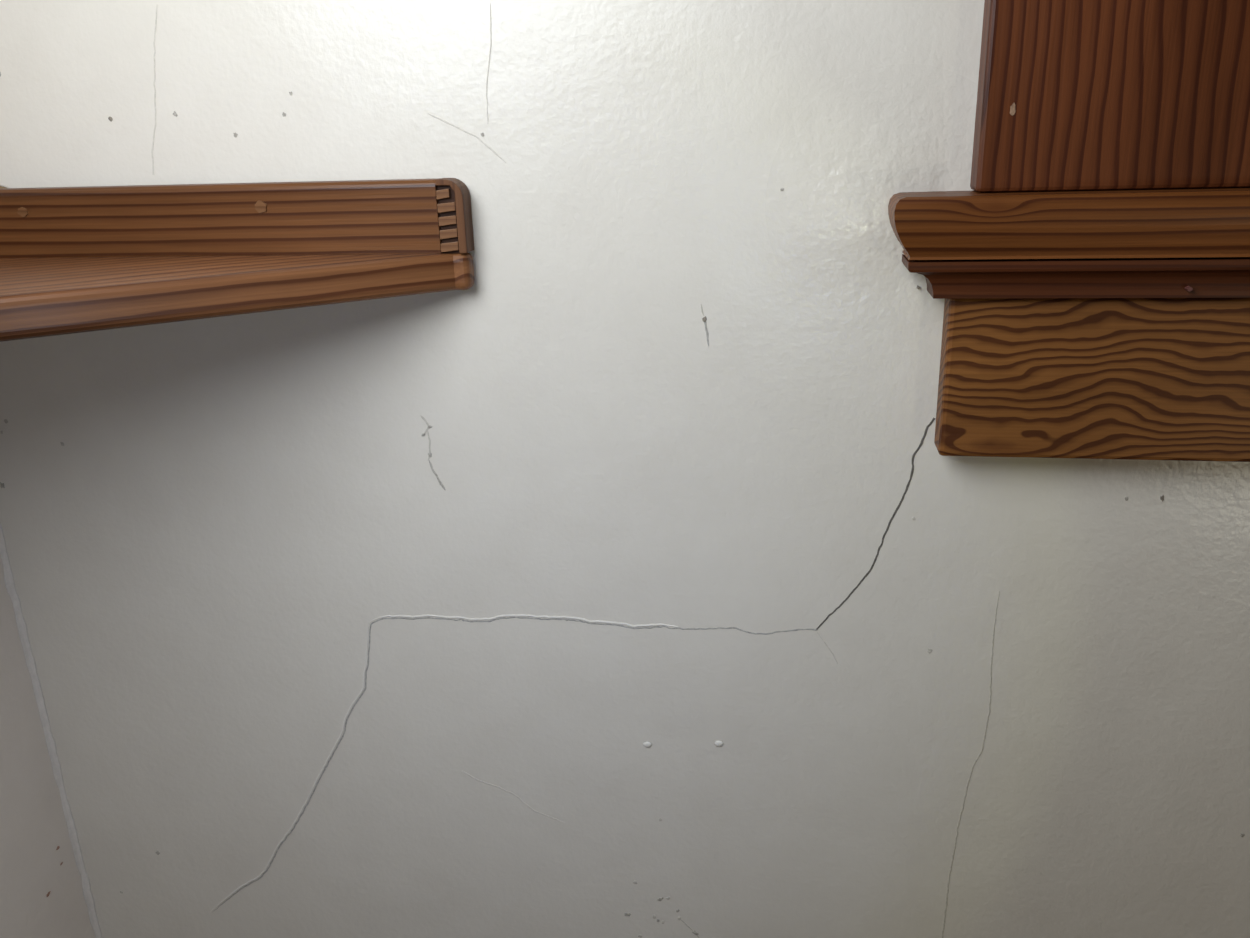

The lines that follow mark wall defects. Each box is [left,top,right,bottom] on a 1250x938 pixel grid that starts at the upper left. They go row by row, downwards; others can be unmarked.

crack [210,415,935,912]